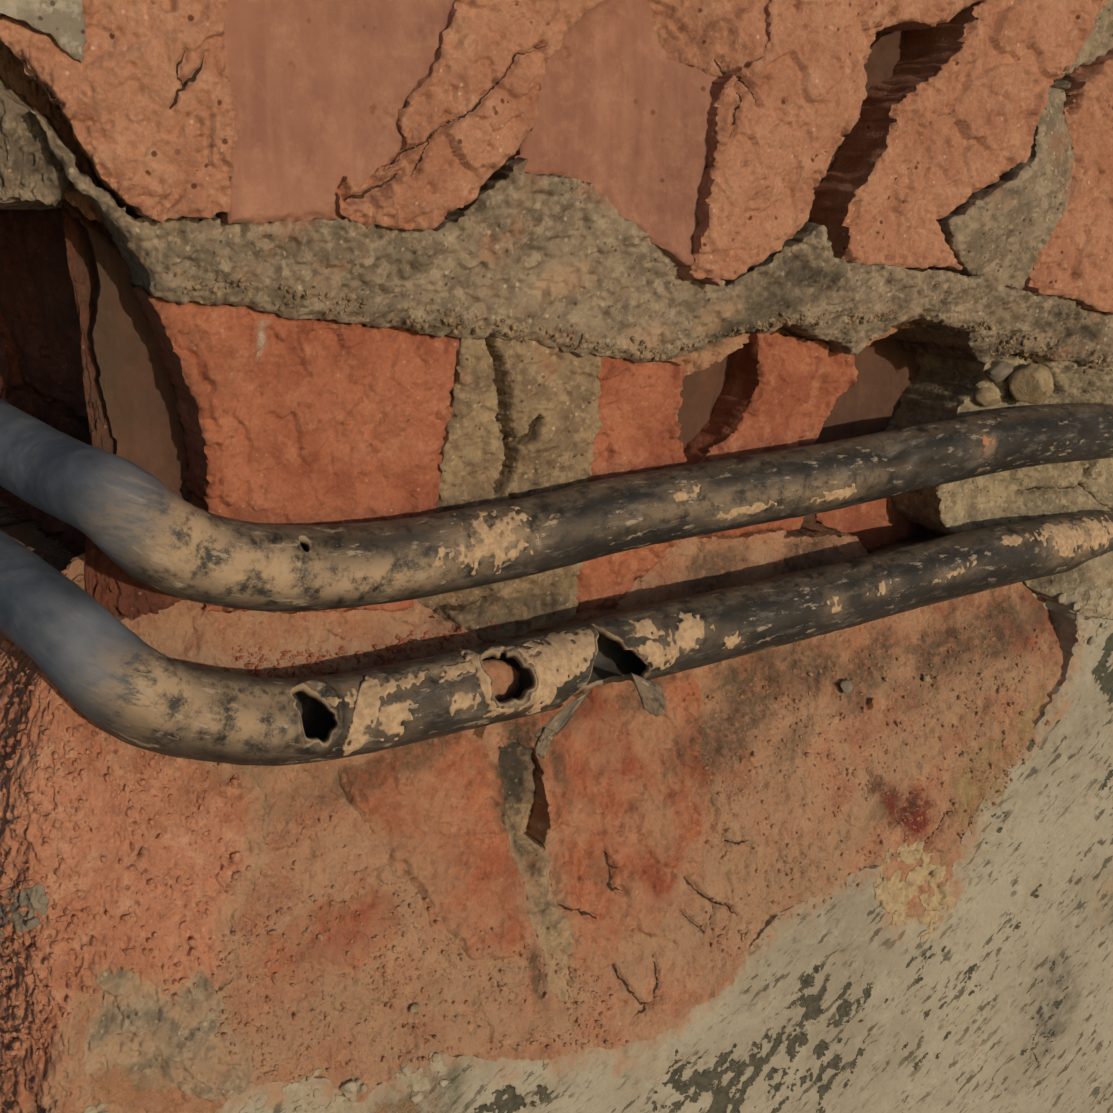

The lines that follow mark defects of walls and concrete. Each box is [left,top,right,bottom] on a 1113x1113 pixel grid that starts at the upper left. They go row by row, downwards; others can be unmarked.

crack [343,46,546,201]
crack [495,399,522,445]
crack [604,851,622,891]
spalling [0,882,50,945]
crack [557,904,598,919]
crack [679,877,737,930]
spalling [874,841,957,984]
crack [612,954,659,1018]
peeling [964,963,981,996]
peeling [912,980,961,1070]
peeling [1020,986,1068,1056]
peeling [474,1084,554,1113]